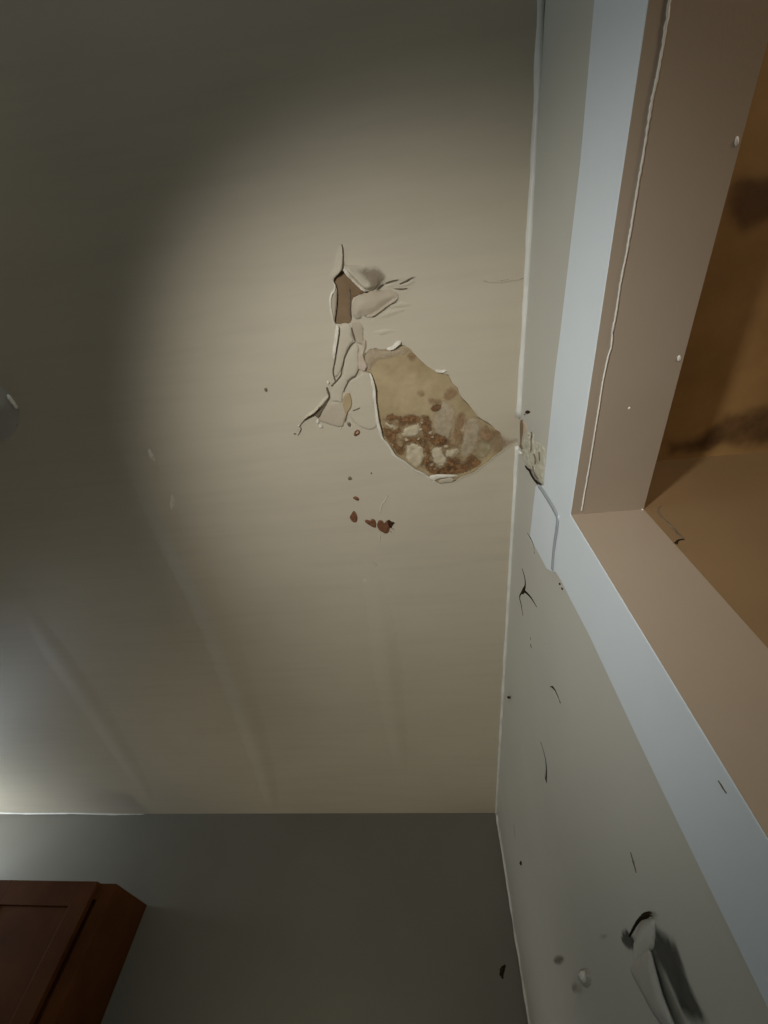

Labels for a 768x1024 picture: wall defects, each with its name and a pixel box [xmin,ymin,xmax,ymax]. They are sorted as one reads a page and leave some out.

spalling [316,244,546,485]
corrosion [350,496,394,533]
crack [519,533,537,648]
crack [540,744,548,783]
peeling [621,911,702,1024]